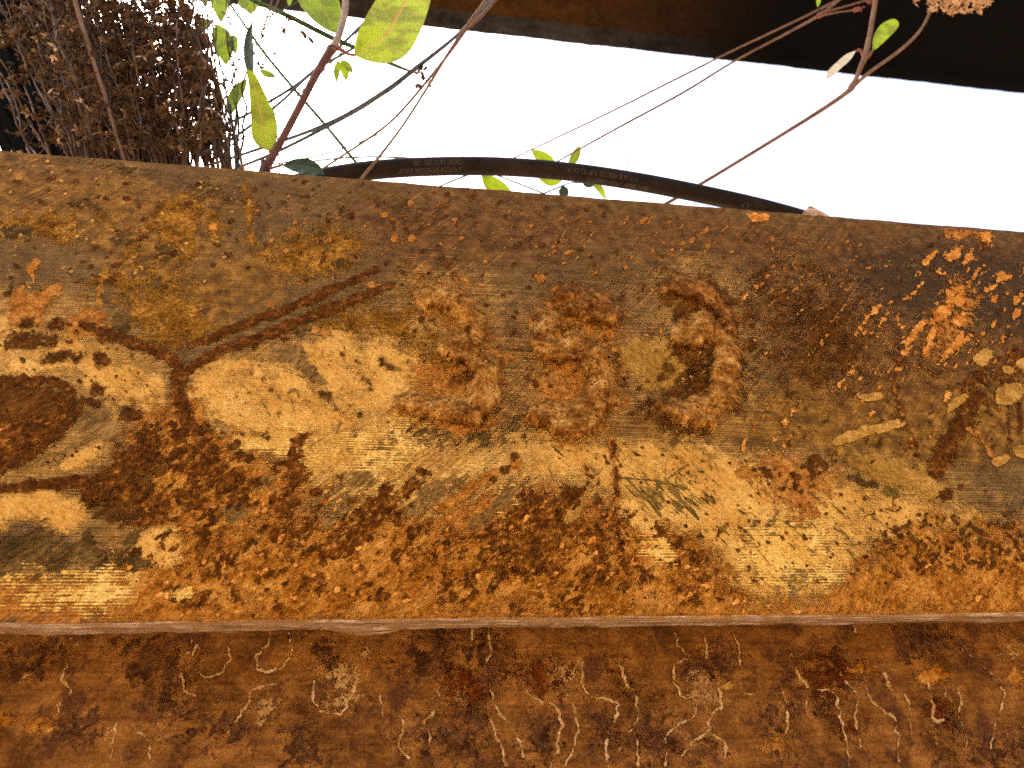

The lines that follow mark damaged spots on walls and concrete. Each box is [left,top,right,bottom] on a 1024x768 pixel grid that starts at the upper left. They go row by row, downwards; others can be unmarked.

corrosion [0,160,189,297]
corrosion [0,183,1024,621]